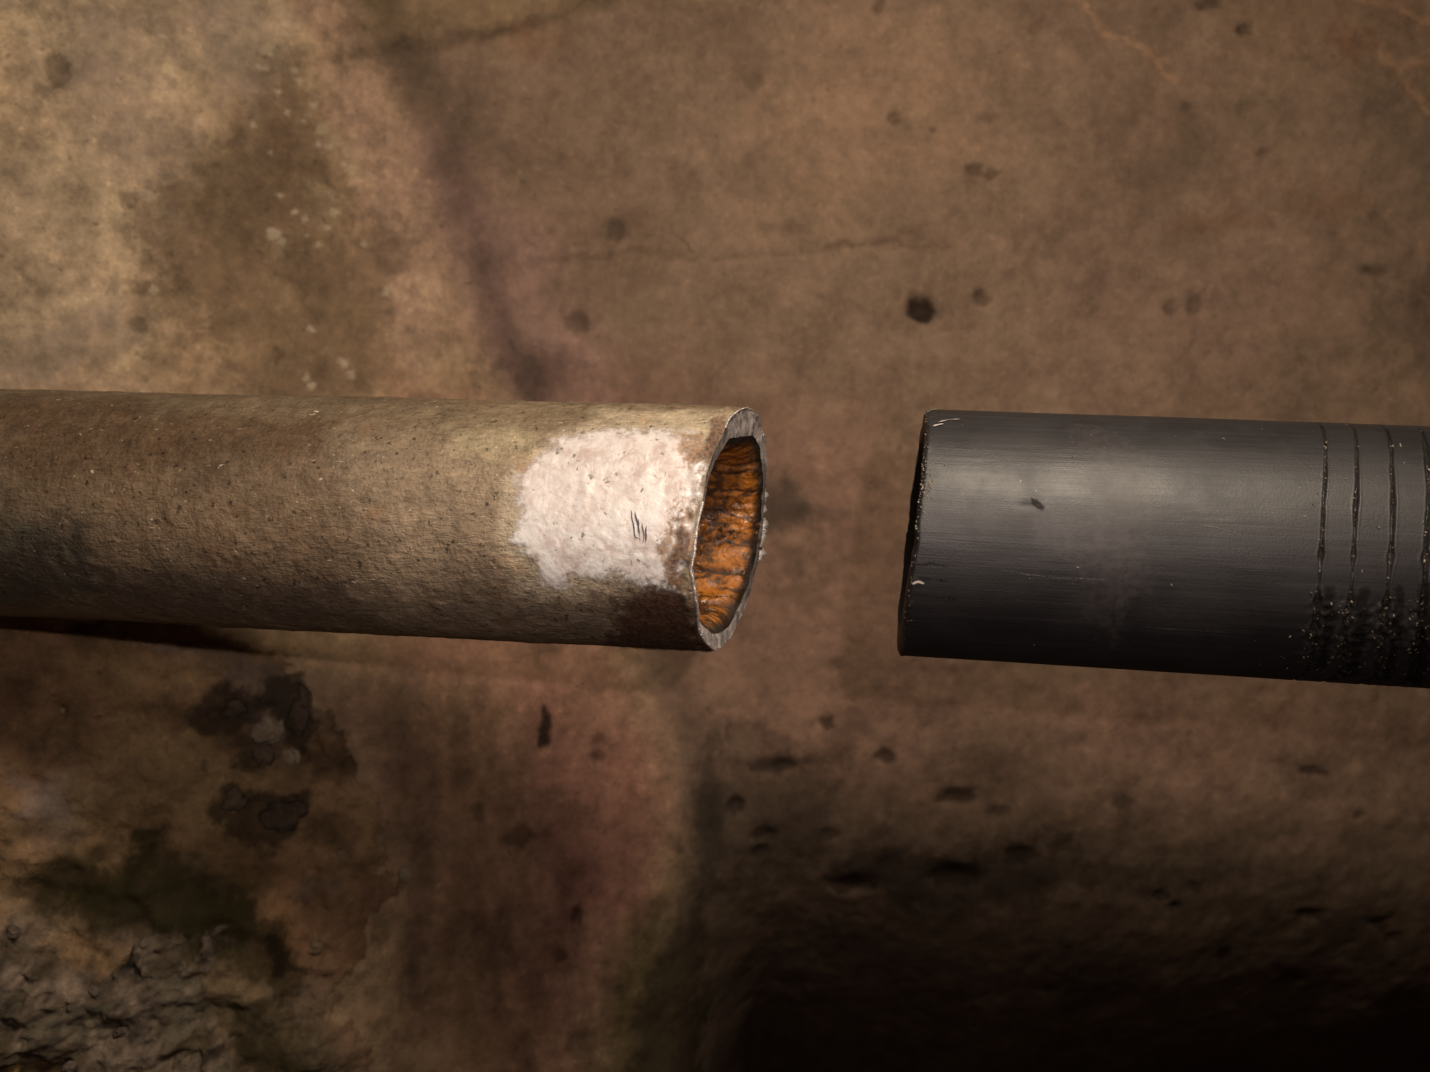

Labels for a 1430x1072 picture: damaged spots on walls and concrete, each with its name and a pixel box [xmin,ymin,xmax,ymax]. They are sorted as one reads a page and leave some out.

spalling [0,620,402,1072]
water stain [158,894,300,996]